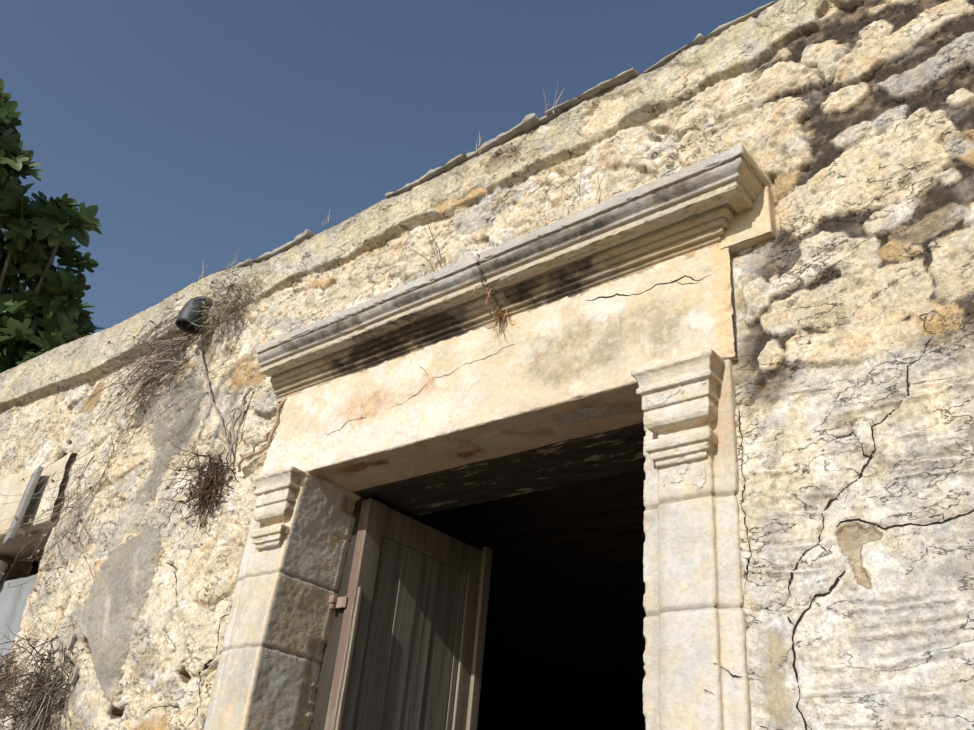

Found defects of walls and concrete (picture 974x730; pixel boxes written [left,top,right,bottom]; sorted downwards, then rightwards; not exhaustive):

damp [557,216,613,245]
damp [478,256,528,278]
damp [504,258,593,308]
crack [588,275,708,301]
damp [289,313,468,374]
damp [530,317,623,381]
crack [738,335,974,730]
spalling [836,523,883,589]